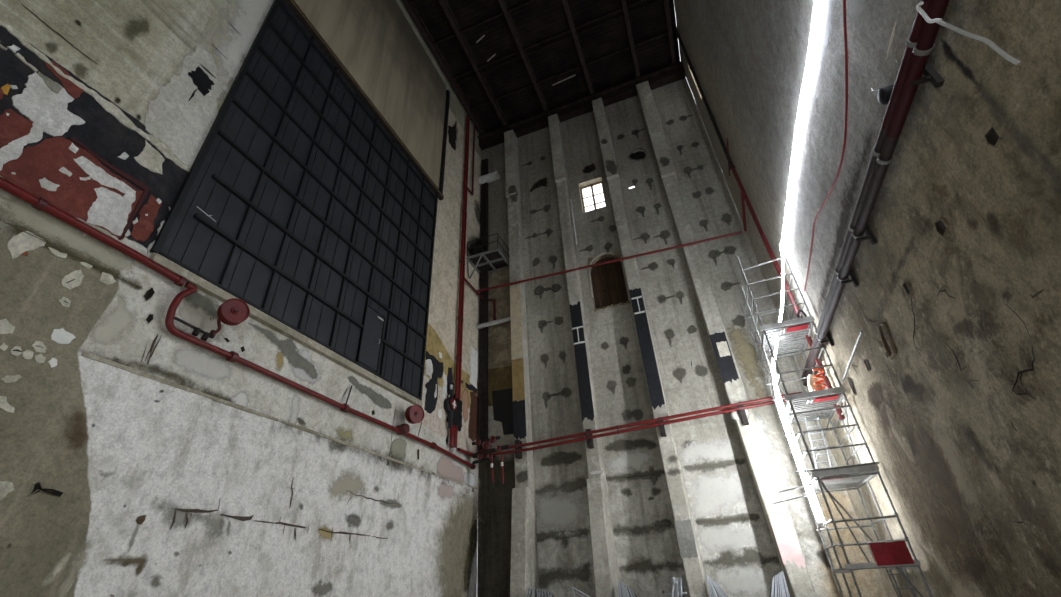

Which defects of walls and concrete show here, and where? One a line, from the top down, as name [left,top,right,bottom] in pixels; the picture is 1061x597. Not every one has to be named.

peeling [0,44,171,254]
crack [1005,290,1043,399]
crack [170,477,388,540]
crack [346,490,397,510]
damp [516,470,528,483]
damp [536,438,779,597]